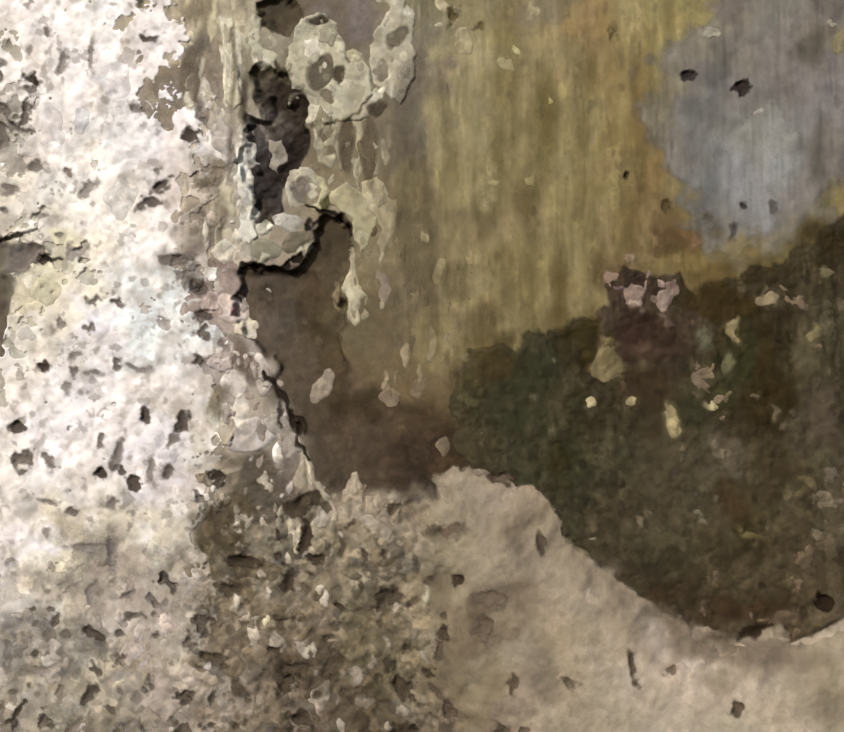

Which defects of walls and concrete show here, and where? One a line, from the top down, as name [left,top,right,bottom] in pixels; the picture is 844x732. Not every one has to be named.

water stain [447,7,460,29]
water stain [496,44,521,72]
peeling [604,270,680,329]
peeling [755,285,810,311]
peeling [0,0,466,732]
peeling [589,336,624,382]
peeling [691,352,737,420]
peeling [724,316,741,344]
water stain [449,215,844,644]
peeling [666,404,687,481]
peeling [793,458,844,509]
peeling [790,519,834,594]